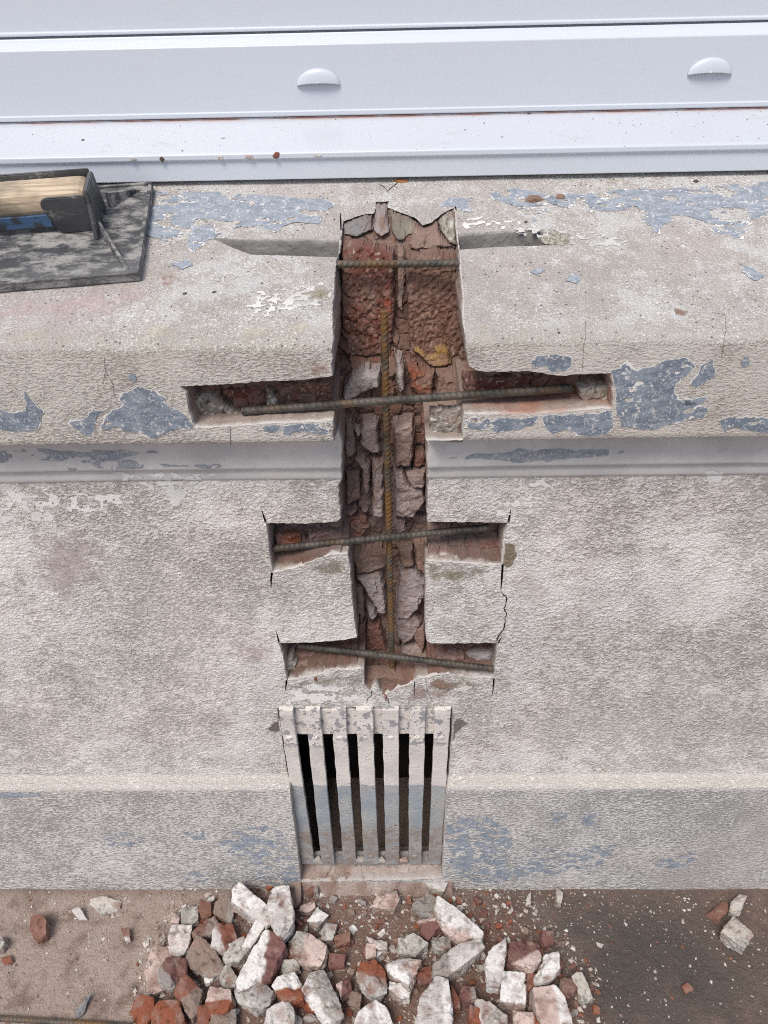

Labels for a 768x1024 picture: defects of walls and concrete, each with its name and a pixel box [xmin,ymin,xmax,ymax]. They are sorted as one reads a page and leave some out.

peeling [0,390,44,433]
spalling [68,180,768,704]
peeling [0,449,221,511]
crack [497,591,507,640]
spalling [297,734,312,779]
spalling [323,734,336,778]
spalling [347,734,359,778]
spalling [373,734,384,778]
spalling [399,734,409,778]
spalling [424,734,433,778]